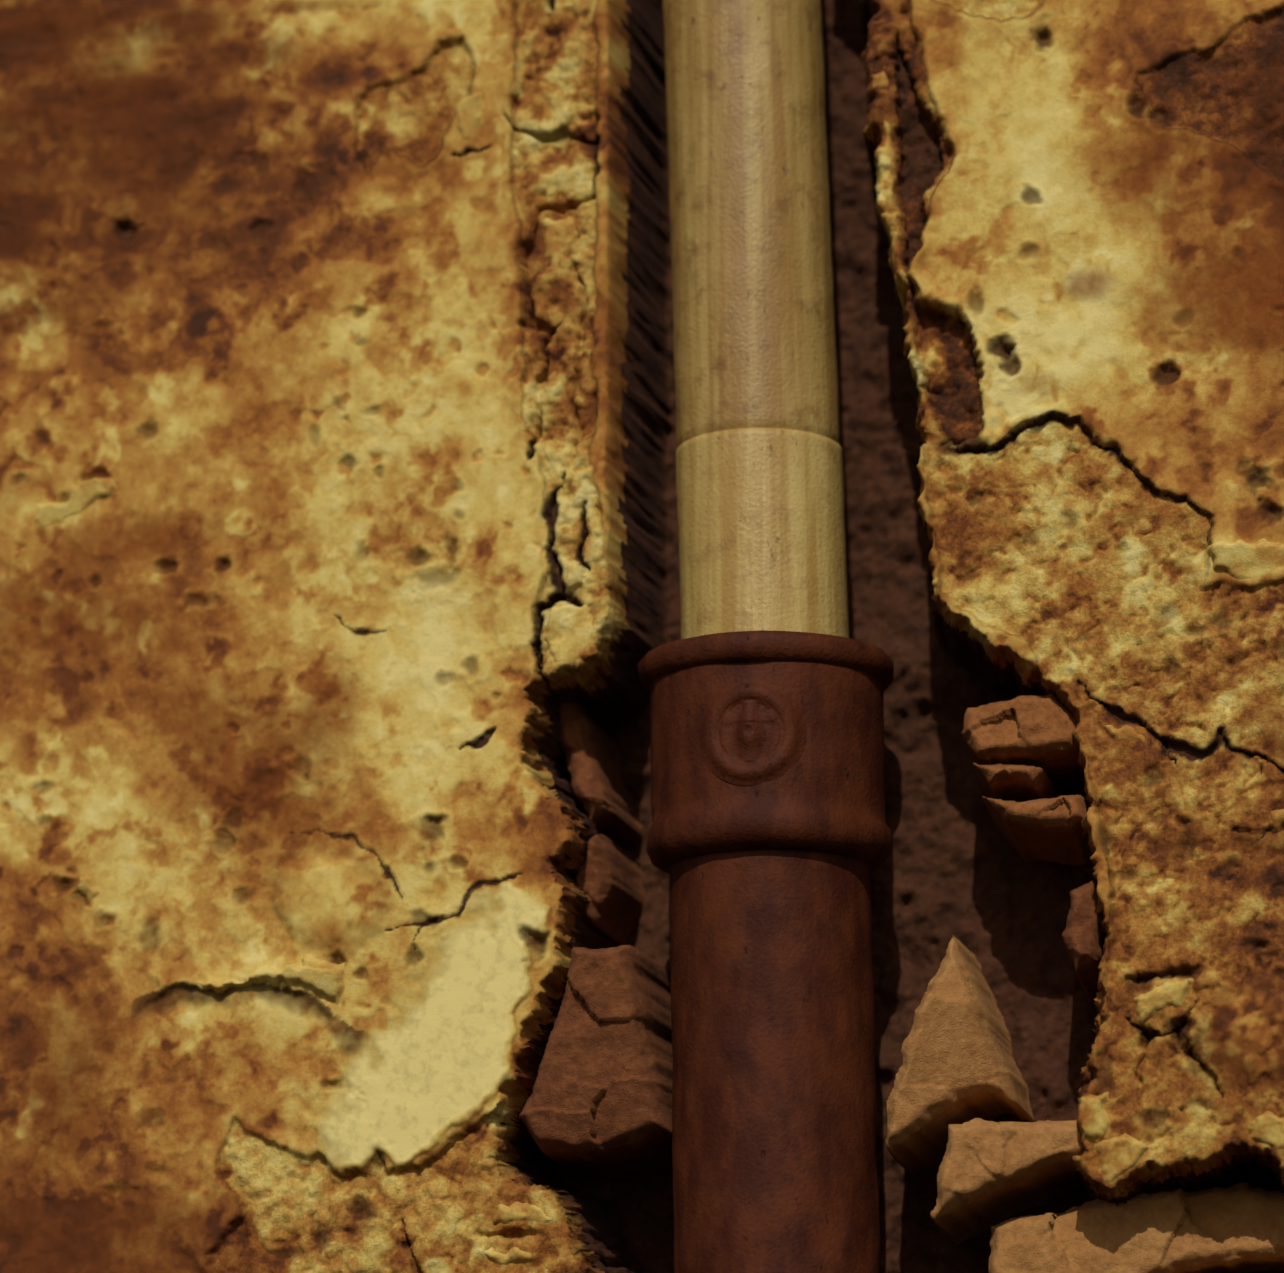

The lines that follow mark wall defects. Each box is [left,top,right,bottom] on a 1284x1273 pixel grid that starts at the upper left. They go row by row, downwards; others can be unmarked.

flaking render [510,0,627,704]
crack [947,411,1212,545]
flaking render [861,0,1284,1199]
crack [1076,680,1269,773]
crack [290,829,522,949]
flaking render [205,1113,593,1273]